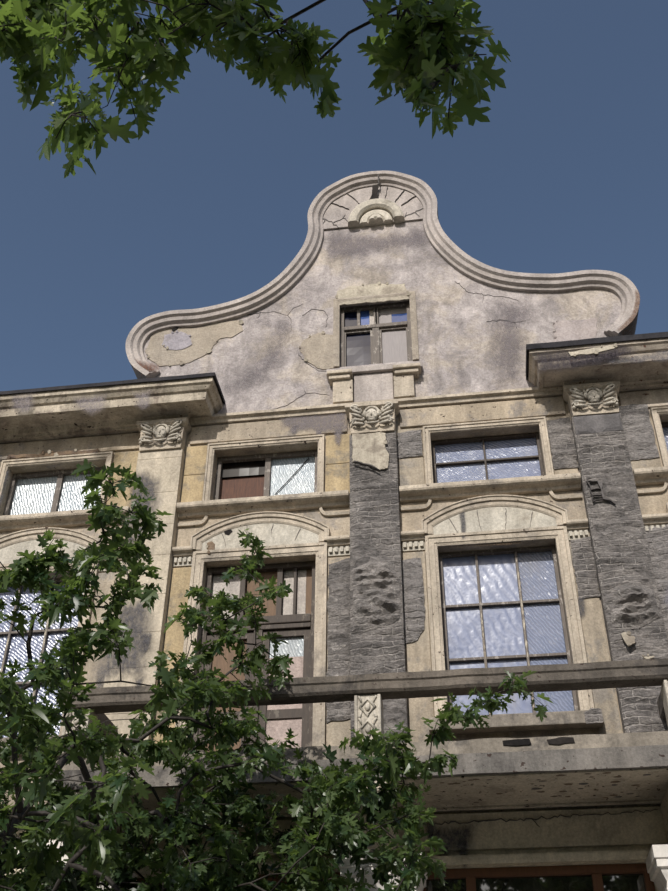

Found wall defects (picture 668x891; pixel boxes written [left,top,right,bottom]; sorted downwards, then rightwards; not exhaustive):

crack [249,304,328,332]
crack [455,281,522,328]
flaking render [326,430,425,676]
flaking render [547,404,668,661]
flaking render [326,701,354,737]
flaking render [382,699,407,743]
spalling [584,708,603,724]
flaking render [619,686,668,733]
crack [429,809,658,827]